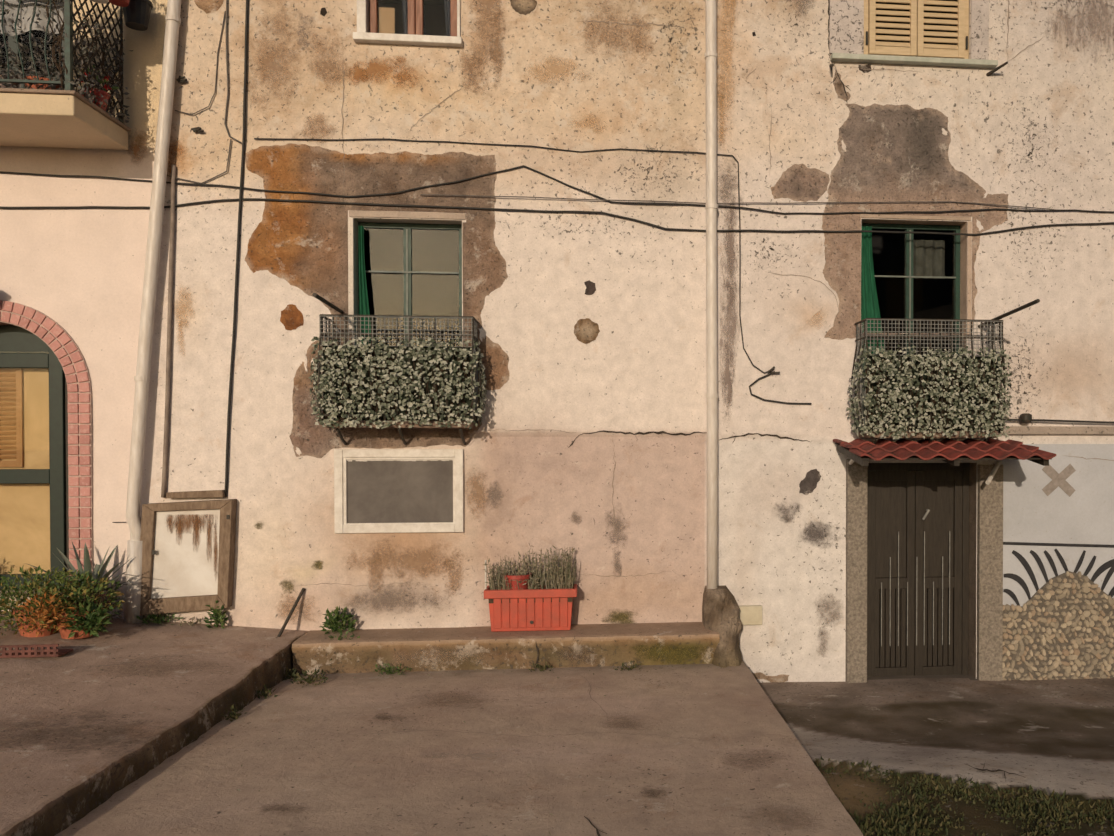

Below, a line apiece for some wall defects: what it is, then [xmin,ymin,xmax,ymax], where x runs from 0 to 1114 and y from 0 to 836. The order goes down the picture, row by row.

flaking render [193,0,225,15]
flaking render [509,0,538,16]
flaking render [769,67,1012,340]
flaking render [241,117,513,461]
flaking render [583,279,597,296]
flaking render [573,317,601,345]
crack [488,429,810,577]
leakage [804,524,828,542]
leakage [355,546,460,608]